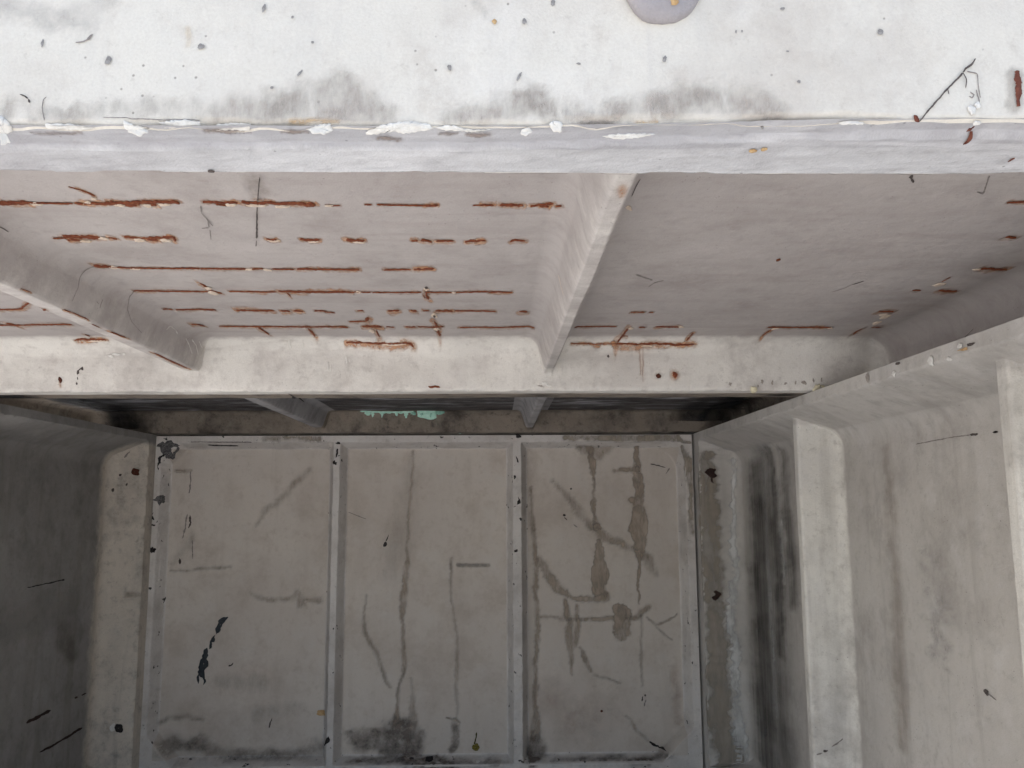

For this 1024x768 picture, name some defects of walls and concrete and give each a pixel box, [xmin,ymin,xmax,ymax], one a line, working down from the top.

crack [914,58,981,122]
peeling [156,440,180,470]
water stain [527,397,754,767]
water stain [754,498,796,655]
peeling [197,617,228,685]